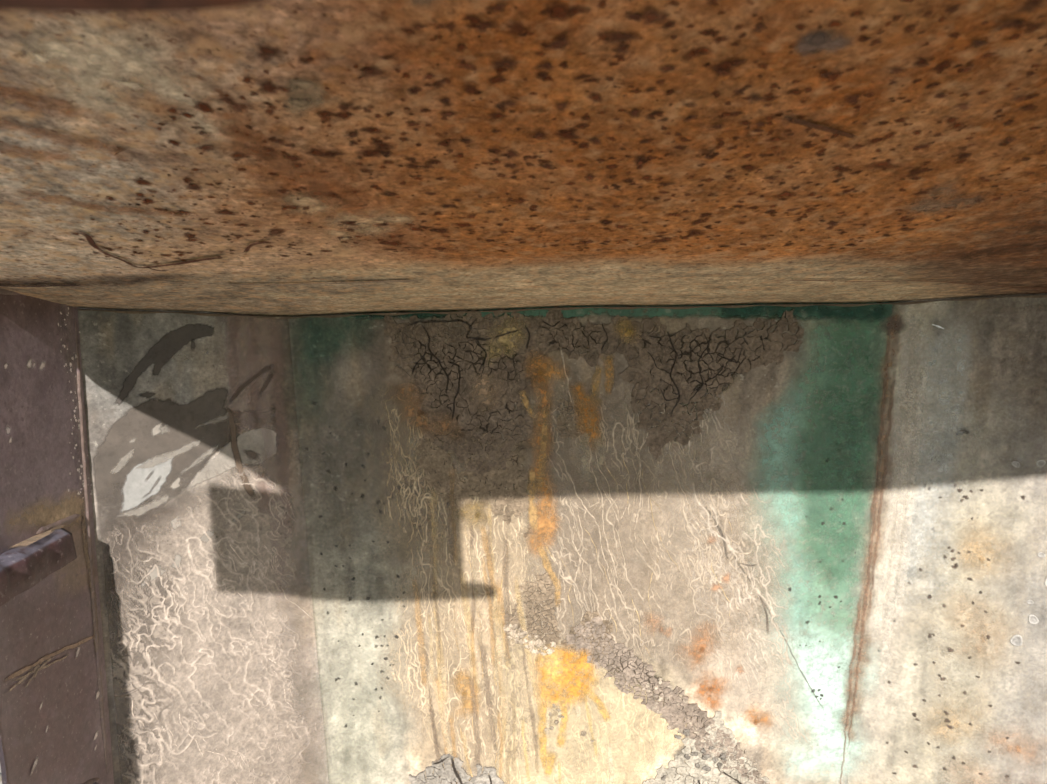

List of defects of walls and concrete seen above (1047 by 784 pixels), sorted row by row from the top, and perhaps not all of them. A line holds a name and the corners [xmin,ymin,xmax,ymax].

corrosion [34,41,192,102]
corrosion [291,197,325,211]
corrosion [522,357,561,600]
leakage [544,397,678,687]
crack [715,522,755,579]
crack [761,600,784,636]
corrosion [537,649,609,774]